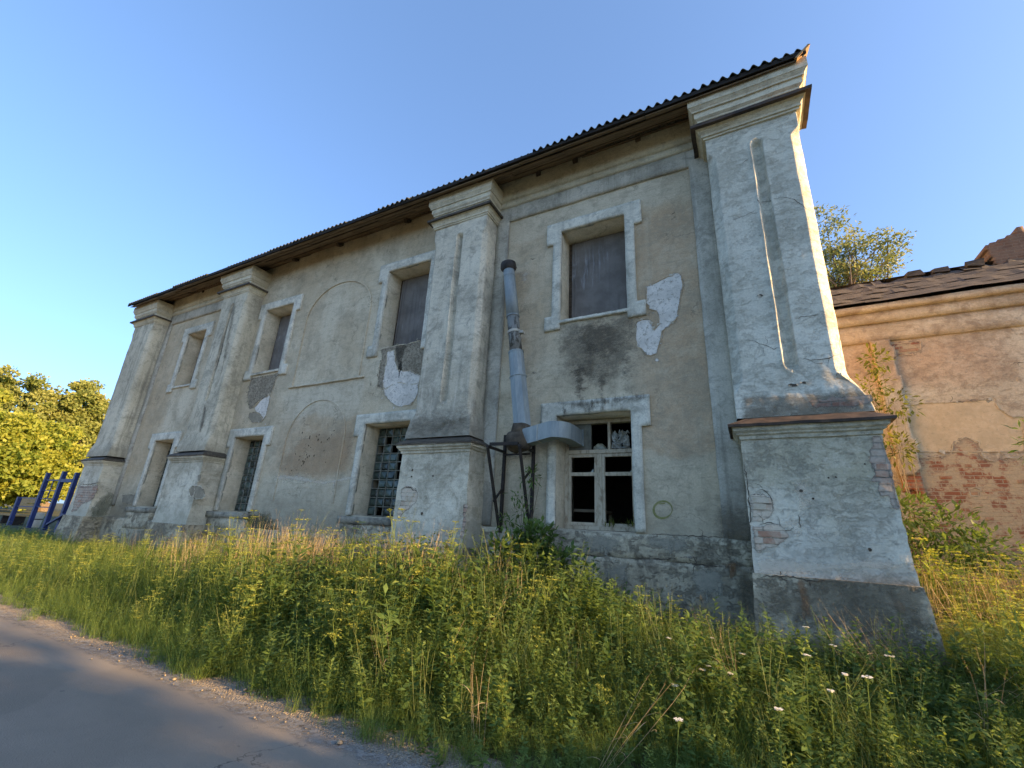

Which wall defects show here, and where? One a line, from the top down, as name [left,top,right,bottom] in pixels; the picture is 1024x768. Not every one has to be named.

peeling [635,273,684,361]
flaking render [246,373,278,425]
peeling [370,338,424,409]
flaking render [864,397,1024,560]
flaking render [750,493,789,553]